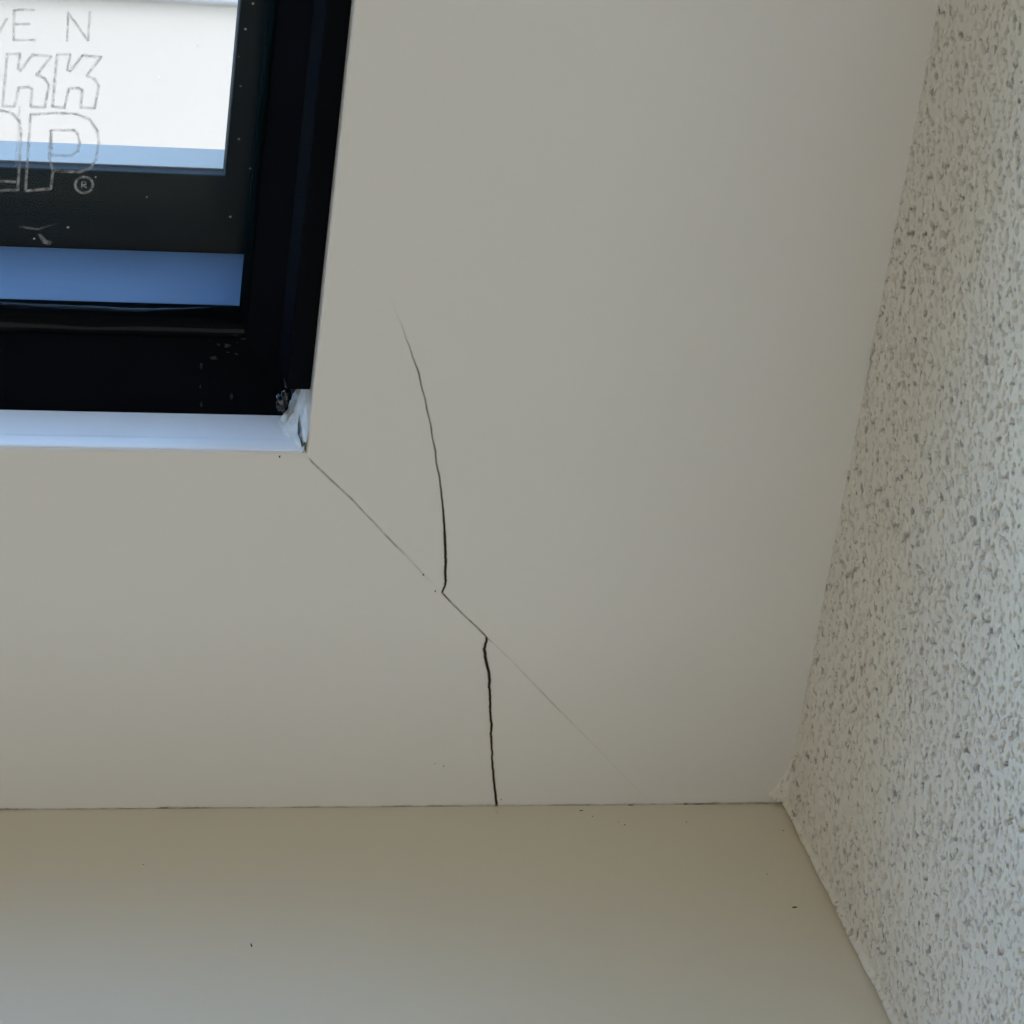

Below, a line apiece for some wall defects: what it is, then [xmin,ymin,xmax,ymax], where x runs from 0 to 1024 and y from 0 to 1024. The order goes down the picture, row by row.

crack [416,367,498,806]